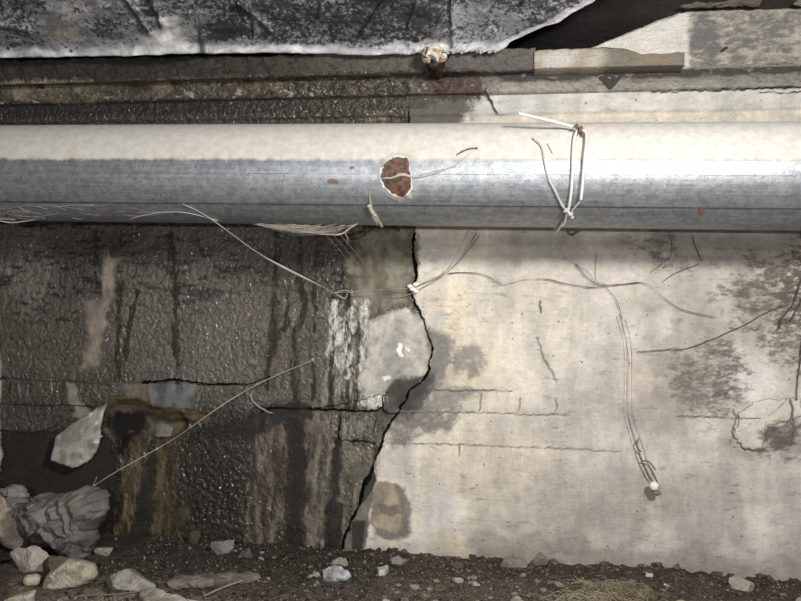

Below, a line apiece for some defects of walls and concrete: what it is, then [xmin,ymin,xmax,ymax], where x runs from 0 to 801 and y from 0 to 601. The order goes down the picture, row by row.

rust [381,157,411,197]
water stain [711,250,801,375]
crack [141,376,271,386]
water stain [0,221,483,551]
crack [261,233,617,550]
water stain [670,339,751,417]
spalling [50,395,212,469]